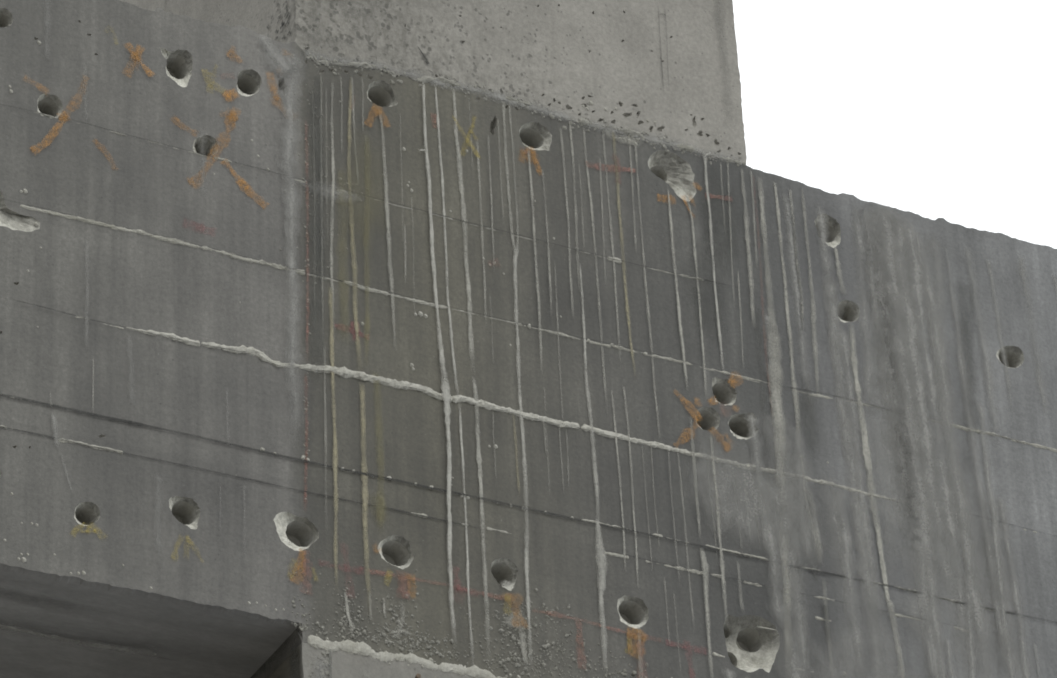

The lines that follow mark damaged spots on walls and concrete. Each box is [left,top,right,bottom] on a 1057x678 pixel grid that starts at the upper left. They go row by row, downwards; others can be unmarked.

spalling [0,191,40,232]
leakage [321,124,338,573]
leakage [420,86,488,641]
leakage [503,104,526,482]
leakage [520,537,530,660]
leakage [595,521,606,655]
leakage [564,125,651,499]
spalling [648,150,697,201]
leakage [668,192,687,377]
spalling [724,614,780,673]
leakage [701,153,821,678]
leakage [819,210,991,678]